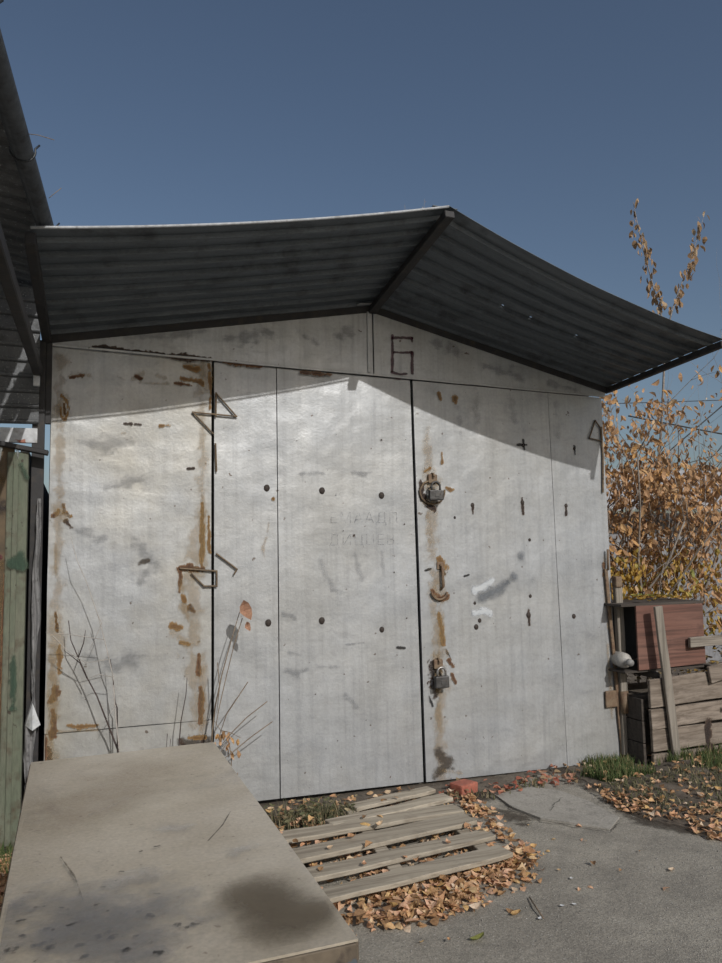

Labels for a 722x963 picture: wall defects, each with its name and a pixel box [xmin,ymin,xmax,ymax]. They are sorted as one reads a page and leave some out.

corrosion [60,394,70,421]
corrosion [92,344,212,410]
corrosion [419,452,444,513]
corrosion [51,503,73,526]
corrosion [176,502,211,612]
corrosion [431,588,450,647]
corrosion [168,621,211,745]
corrosion [427,658,457,699]